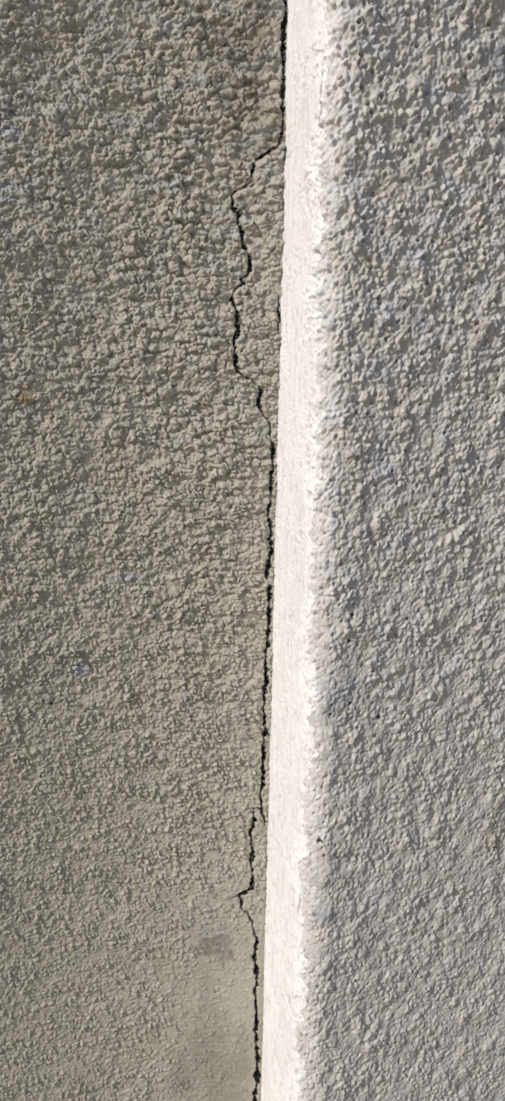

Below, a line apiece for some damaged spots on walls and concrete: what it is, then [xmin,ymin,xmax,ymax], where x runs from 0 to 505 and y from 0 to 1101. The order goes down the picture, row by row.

crack [229,0,325,1101]